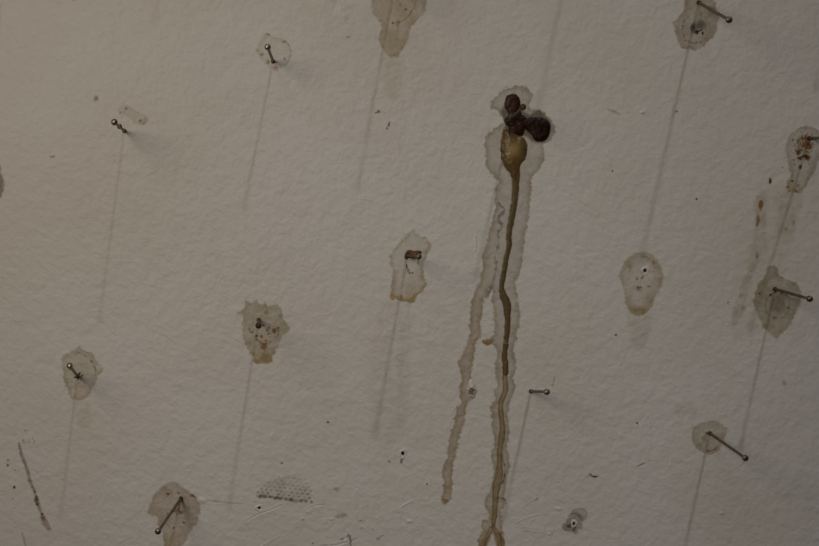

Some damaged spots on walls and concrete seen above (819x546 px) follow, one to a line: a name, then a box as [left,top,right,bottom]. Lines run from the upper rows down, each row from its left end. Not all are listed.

water stain [442,94,551,546]
rust [795,135,812,169]